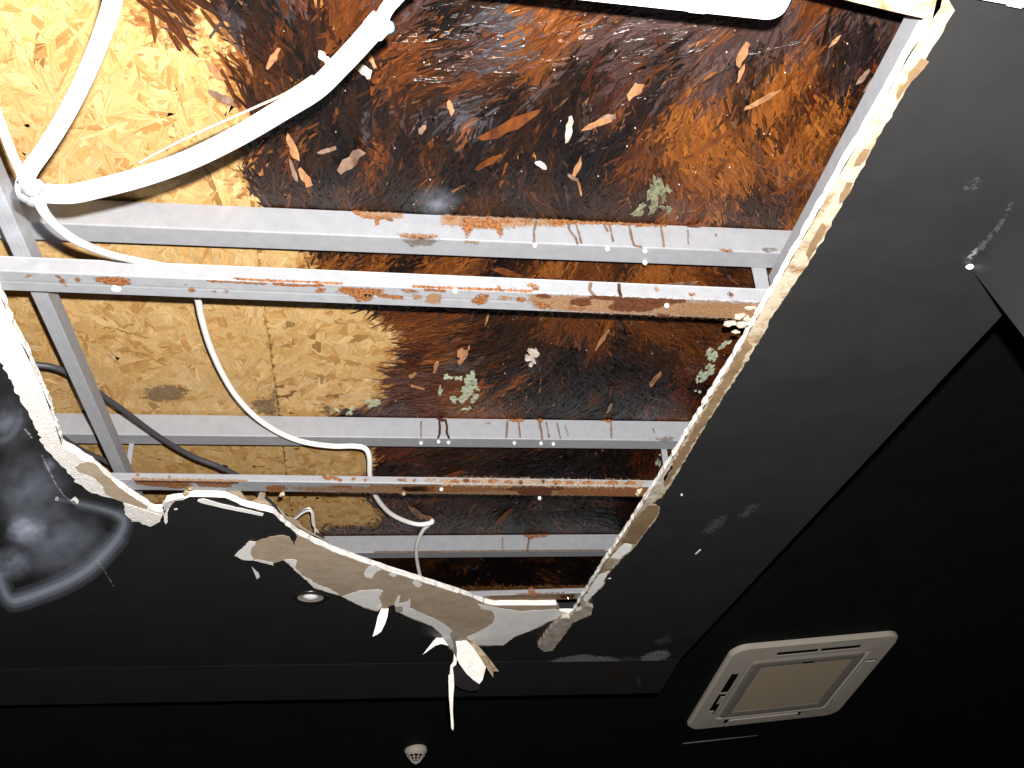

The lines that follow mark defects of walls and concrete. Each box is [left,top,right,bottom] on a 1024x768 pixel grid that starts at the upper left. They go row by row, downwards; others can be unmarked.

leakage [128,0,384,115]
leakage [228,0,906,231]
corrosion [353,210,667,248]
corrosion [95,277,131,286]
corrosion [206,277,759,320]
leakage [298,250,755,288]
leakage [317,303,745,422]
corrosion [436,417,450,439]
corrosion [132,474,248,489]
corrosion [266,475,649,497]
leakage [360,446,672,480]
leakage [319,492,643,536]